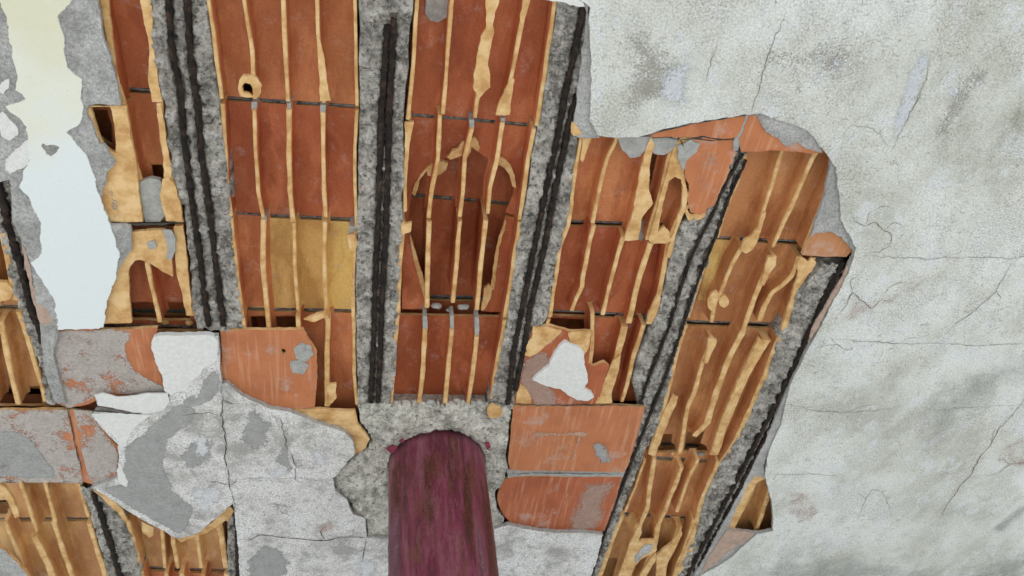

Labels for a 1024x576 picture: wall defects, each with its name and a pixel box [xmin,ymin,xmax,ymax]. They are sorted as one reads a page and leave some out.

peeling [626,27,693,110]
spalling [150,0,247,332]
spalling [334,0,600,576]
corrosion [619,151,740,489]
spalling [591,113,855,576]
crack [819,206,1024,350]
peeling [80,371,223,576]
crack [183,392,262,512]
peeling [241,411,272,450]
peeling [227,515,290,576]
crack [242,416,380,555]
crack [943,400,1024,512]